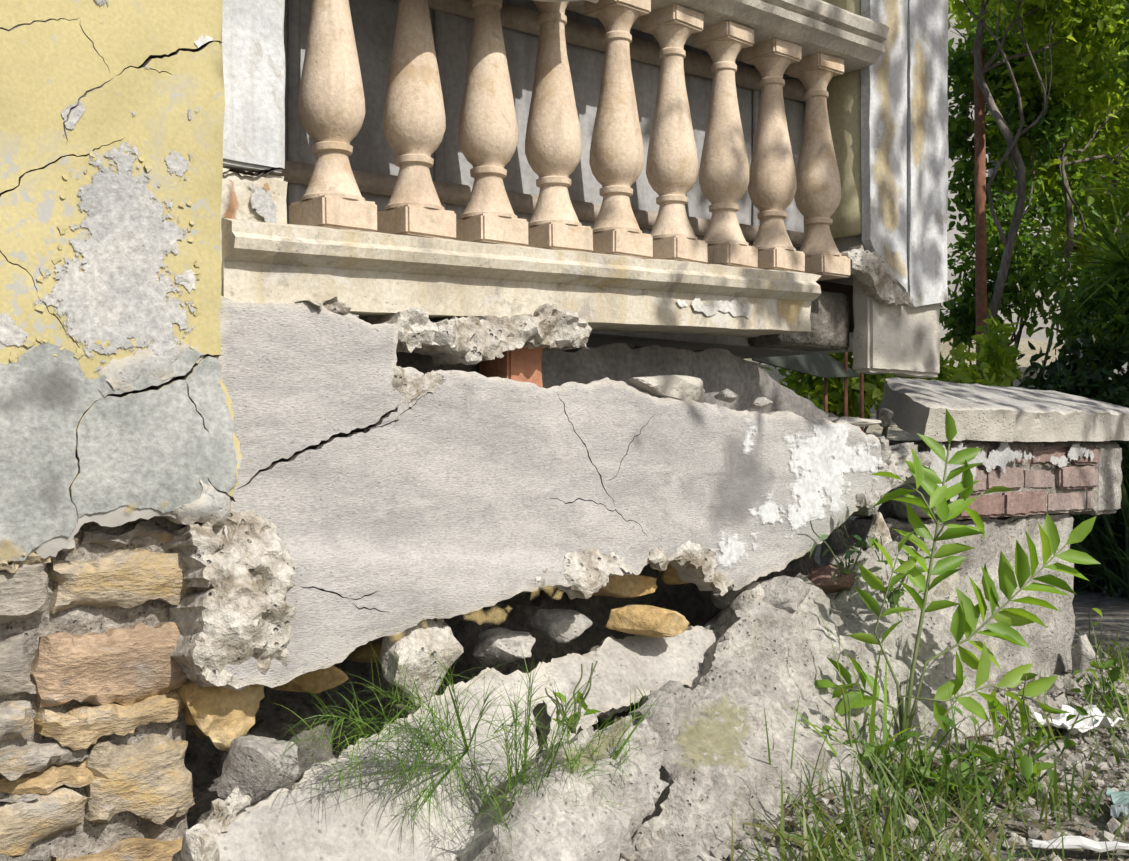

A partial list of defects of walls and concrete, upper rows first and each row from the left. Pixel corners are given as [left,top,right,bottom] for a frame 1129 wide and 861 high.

crack [0,18,223,197]
peeling [250,182,277,223]
crack [0,250,80,348]
flaking render [0,142,237,573]
crack [69,354,221,521]
crack [215,393,428,502]
crack [551,395,654,531]
spalling [849,436,1095,517]
spalling [166,510,297,690]
spalling [197,785,252,838]